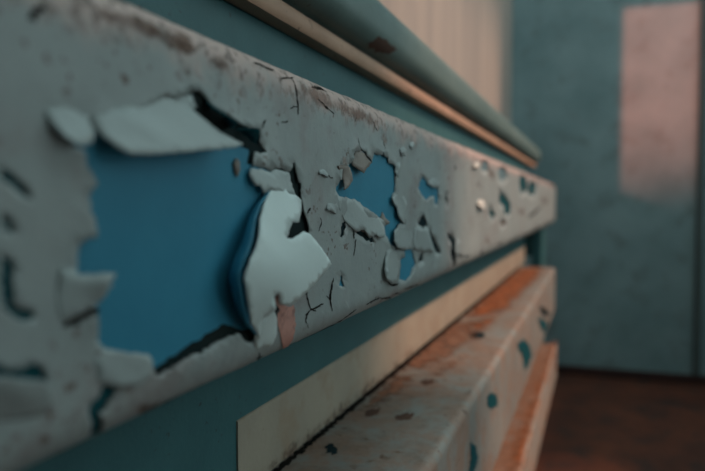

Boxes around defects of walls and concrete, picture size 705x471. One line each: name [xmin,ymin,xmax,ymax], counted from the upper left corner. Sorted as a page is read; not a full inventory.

crack [253,62,334,128]
peeling [326,142,440,284]
peeling [418,177,447,204]
peeling [477,193,510,226]
peeling [519,175,536,196]
peeling [44,94,331,435]
peeling [447,234,466,266]
rust [363,266,542,411]